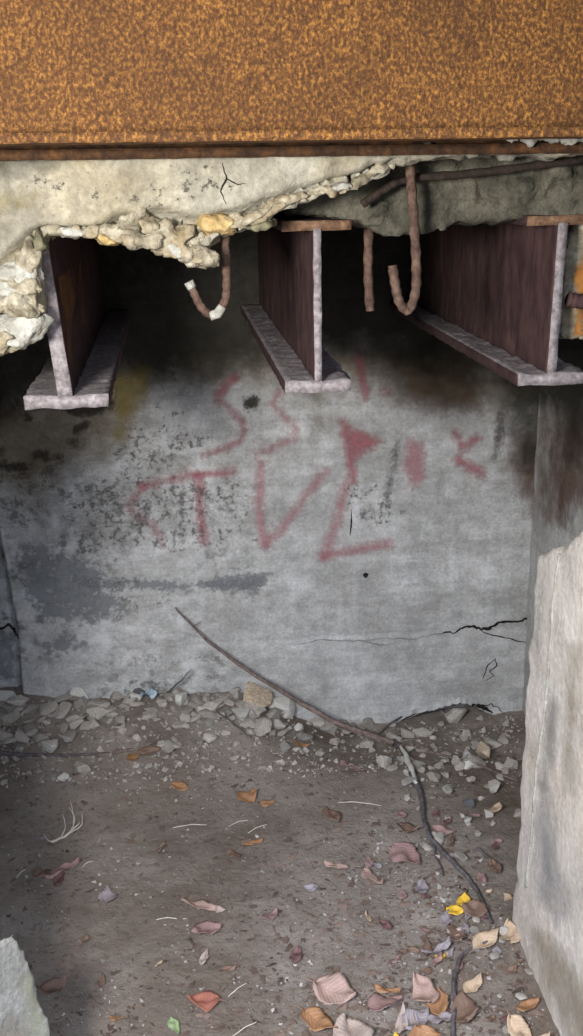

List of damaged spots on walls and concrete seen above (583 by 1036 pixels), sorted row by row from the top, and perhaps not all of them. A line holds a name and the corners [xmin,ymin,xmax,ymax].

crack [220,164,245,204]
spalling [0,155,583,354]
corrosion [574,265,583,294]
water stain [0,371,145,472]
water stain [112,428,203,475]
crack [0,623,19,639]
crack [297,618,527,713]